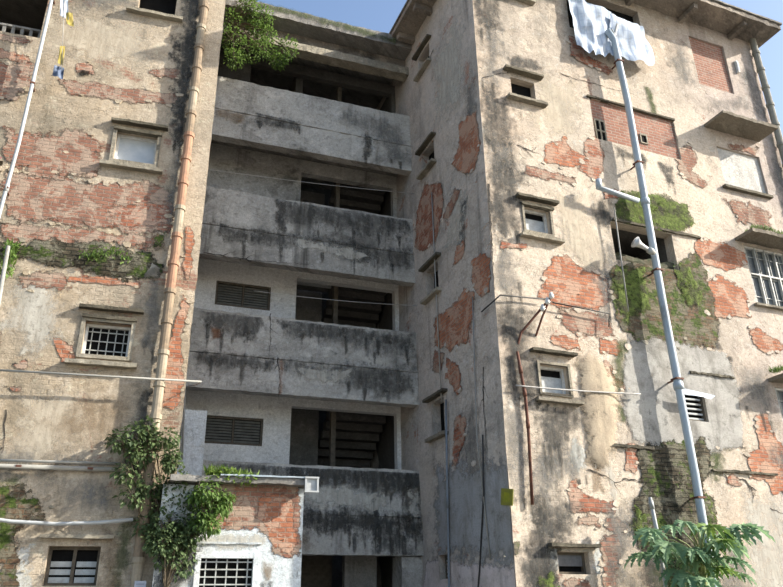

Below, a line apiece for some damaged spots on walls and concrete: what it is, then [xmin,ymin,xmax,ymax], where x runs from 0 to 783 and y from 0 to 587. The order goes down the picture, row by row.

spalling [0,126,174,293]
leakage [168,0,200,204]
leakage [434,0,525,250]
spalling [524,136,605,187]
leakage [498,249,542,407]
spalling [538,237,783,391]
spalling [204,484,302,559]
leakage [225,463,421,555]
leakage [508,404,602,587]
spalling [563,478,630,587]
crack [587,469,646,494]
spalling [623,436,720,553]